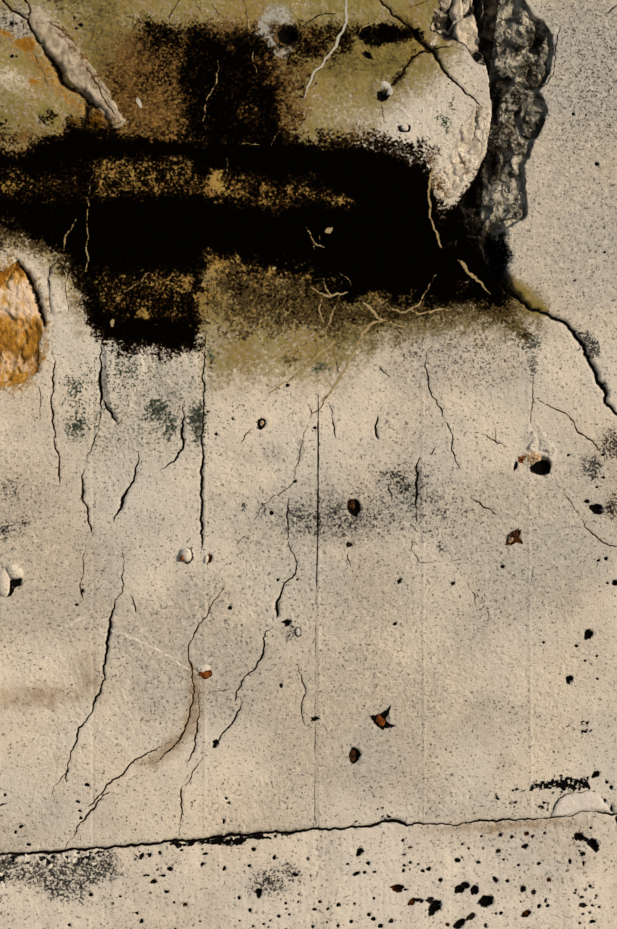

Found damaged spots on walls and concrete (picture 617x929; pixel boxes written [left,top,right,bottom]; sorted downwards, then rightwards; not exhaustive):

corrosion [25,269,54,371]
crack [3,170,122,627]
leakage [0,0,617,453]
crack [0,273,617,856]
spalling [429,0,554,284]
crack [427,166,617,416]